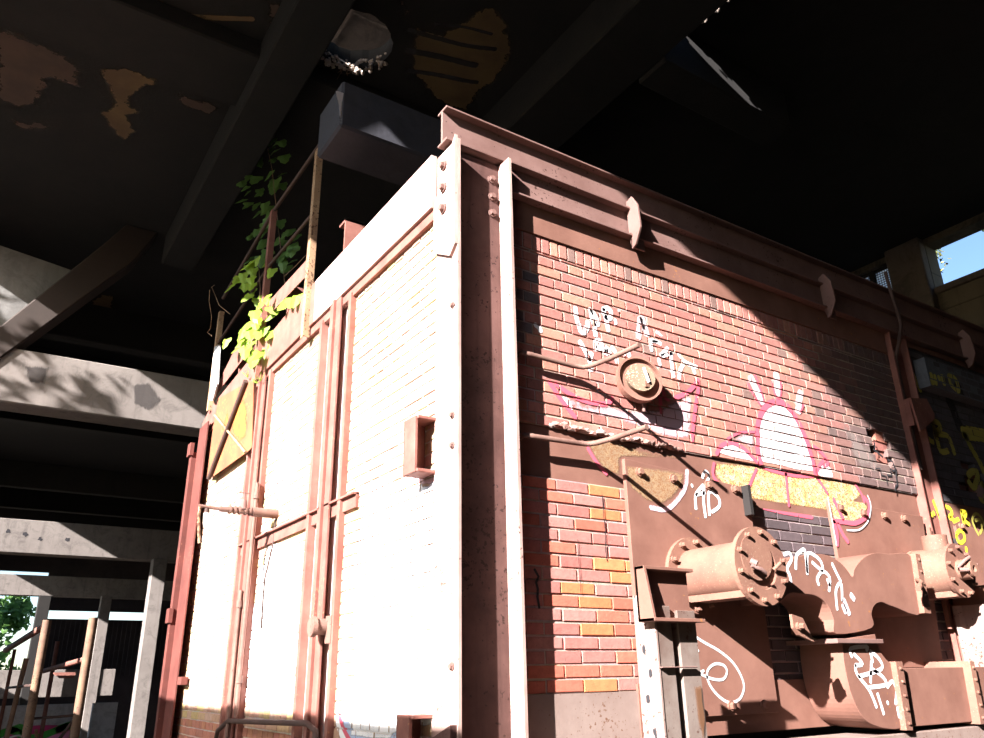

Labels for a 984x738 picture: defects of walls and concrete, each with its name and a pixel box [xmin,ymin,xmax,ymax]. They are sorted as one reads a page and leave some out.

peeling [0,31,80,108]
peeling [100,68,156,139]
peeling [405,8,510,110]
spalling [868,431,887,464]